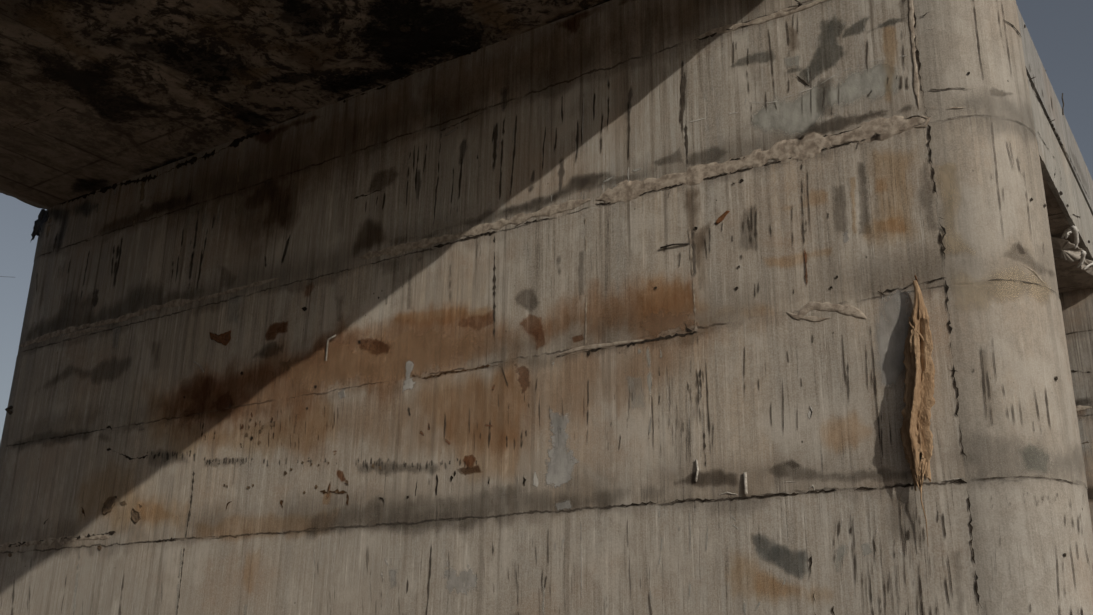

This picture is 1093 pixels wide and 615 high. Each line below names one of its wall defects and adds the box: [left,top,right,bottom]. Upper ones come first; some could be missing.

damp [492,90,517,198]
damp [529,82,610,201]
damp [602,89,640,189]
damp [680,61,706,131]
crack [1030,82,1089,218]
crack [585,12,982,615]
rust [517,366,529,392]
crack [0,507,116,547]
crack [320,484,349,505]
crack [379,471,456,501]